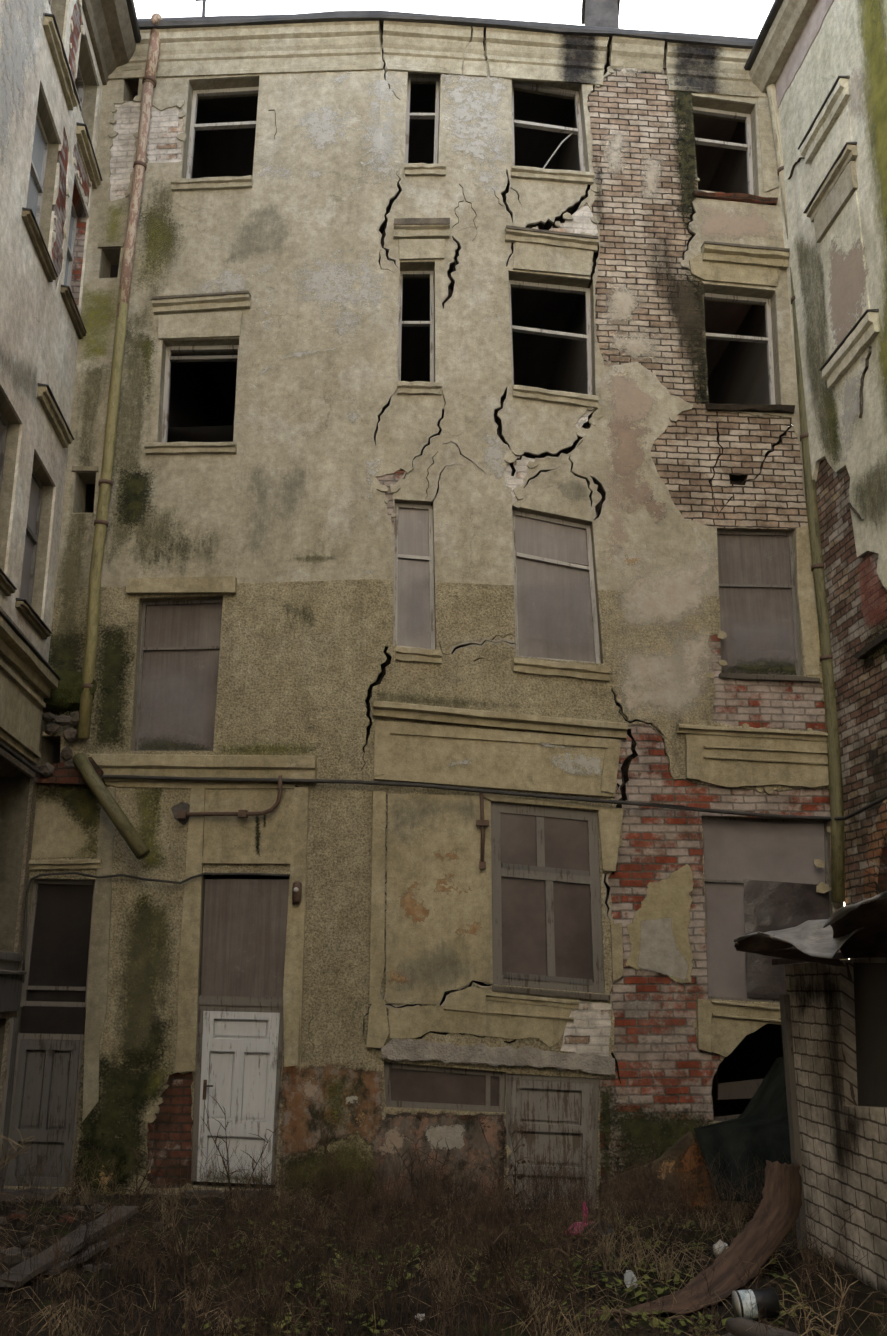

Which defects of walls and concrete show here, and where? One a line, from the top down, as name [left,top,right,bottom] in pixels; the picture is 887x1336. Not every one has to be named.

flaking render [52,130,92,288]
flaking render [108,95,187,201]
leakage [129,185,175,399]
crack [376,169,404,269]
crack [440,168,596,309]
crack [402,385,608,521]
leakage [48,513,208,750]
flaking render [533,63,887,1175]
crack [611,688,671,808]
crack [308,647,547,1064]
leakage [119,894,171,1091]
flaking render [139,1072,193,1190]